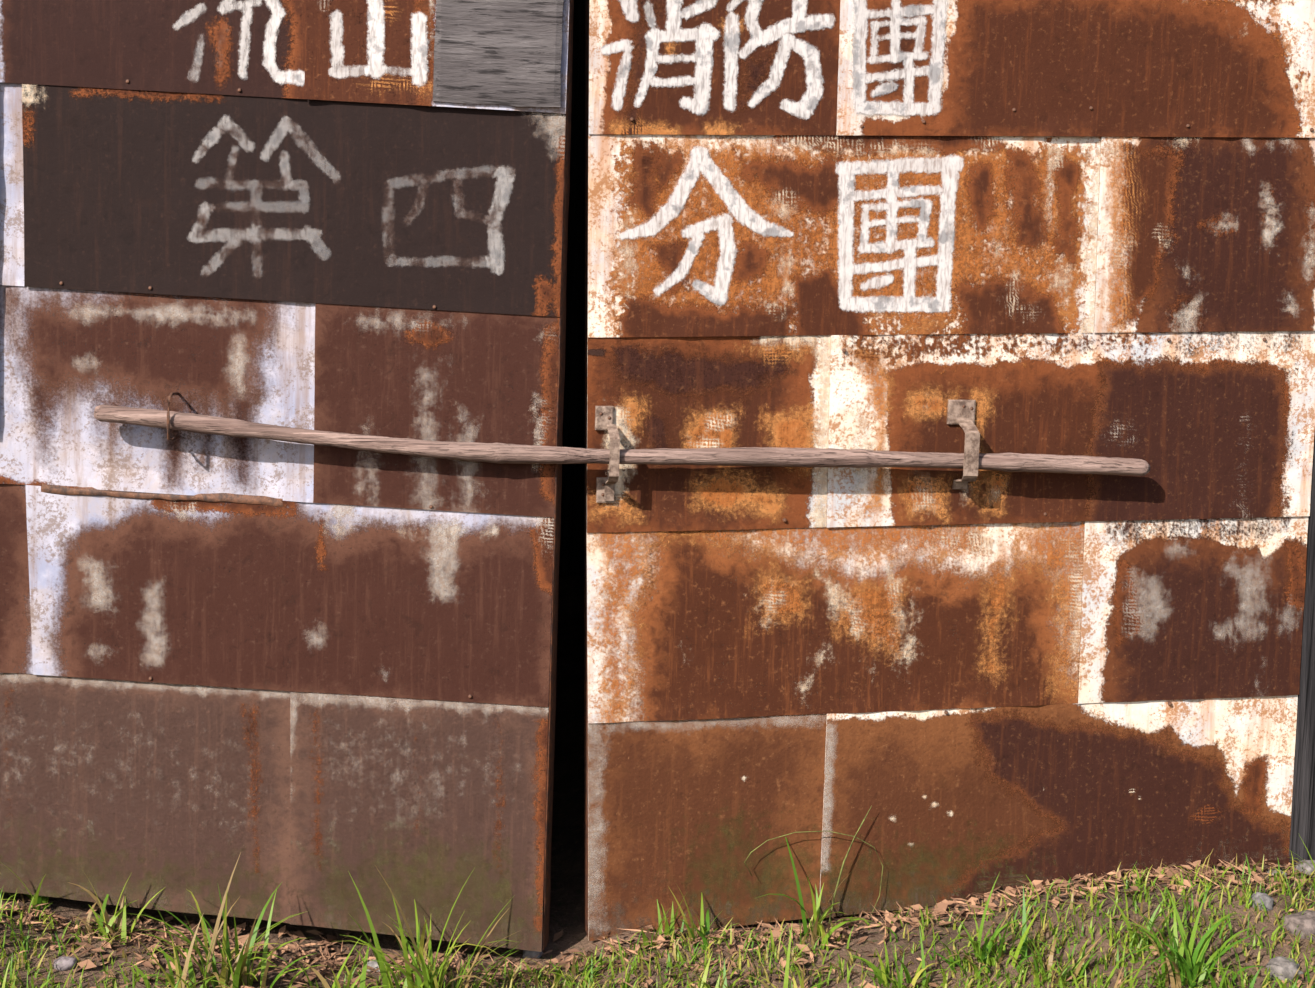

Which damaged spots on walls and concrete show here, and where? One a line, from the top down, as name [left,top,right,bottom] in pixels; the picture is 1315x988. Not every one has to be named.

rust [0,0,565,952]
rust [587,0,1315,941]